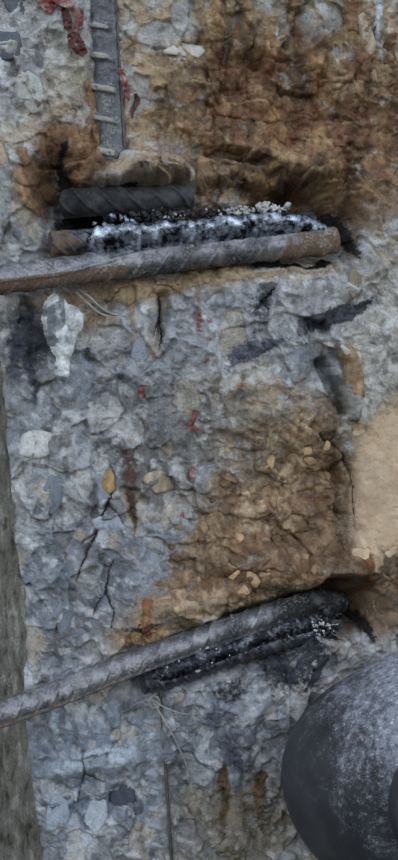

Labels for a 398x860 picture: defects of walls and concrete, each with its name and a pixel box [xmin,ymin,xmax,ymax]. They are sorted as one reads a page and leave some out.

rust [12,79,113,217]
rust [155,0,398,231]
spalling [59,183,195,219]
peeling [41,293,84,382]
crack [75,493,122,581]
rust [116,450,138,536]
spalling [131,392,398,618]
crack [93,558,115,629]
rust [111,598,202,646]
rust [321,550,398,638]